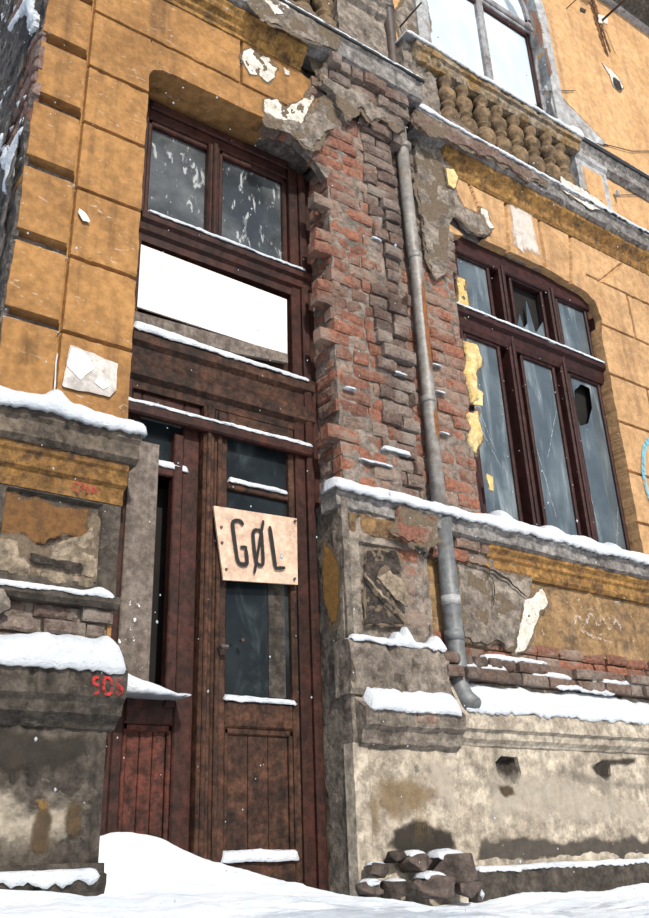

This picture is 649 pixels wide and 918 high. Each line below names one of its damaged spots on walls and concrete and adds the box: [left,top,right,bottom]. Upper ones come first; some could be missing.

corrosion [589,0,611,57]
flaking render [239,0,609,513]
peeling [0,491,101,588]
flaking render [0,588,113,639]
spalling [362,505,442,628]
crack [465,561,527,606]
spalling [453,537,549,657]
hole [495,756,518,797]
water stain [491,777,647,819]
hole [593,758,635,780]
water stain [390,821,455,853]
water stain [478,836,649,860]